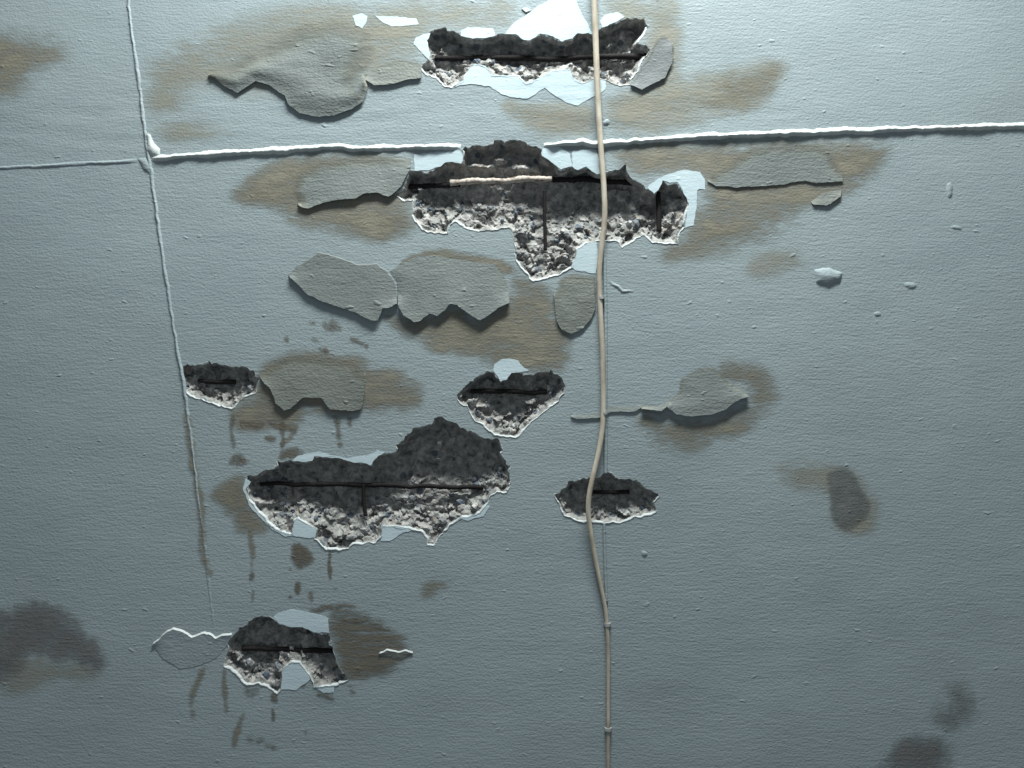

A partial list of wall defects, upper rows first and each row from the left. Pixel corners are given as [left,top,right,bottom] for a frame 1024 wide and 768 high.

spalling [208,0,673,117]
spalling [295,139,843,282]
peeling [180,358,366,411]
spalling [243,358,566,551]
spalling [554,472,660,524]
water stain [829,470,868,528]
water stain [0,602,100,674]
spalling [152,609,350,695]